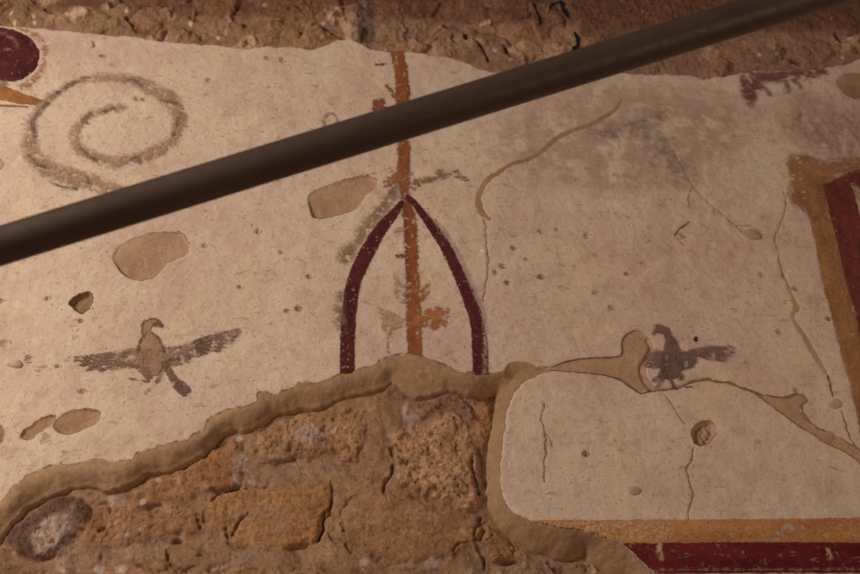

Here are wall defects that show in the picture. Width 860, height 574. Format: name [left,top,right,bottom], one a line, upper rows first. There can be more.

flaking render [309,174,377,219]
crack [475,99,623,301]
flaking render [113,231,189,281]
spalling [69,291,93,323]
crack [651,138,860,464]
spalling [0,384,609,574]
crack [540,403,552,483]
crack [685,447,694,524]
spalling [691,420,716,446]